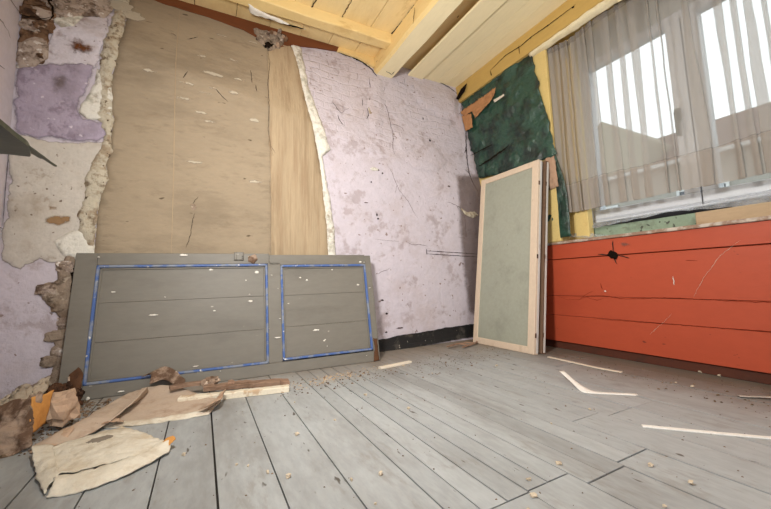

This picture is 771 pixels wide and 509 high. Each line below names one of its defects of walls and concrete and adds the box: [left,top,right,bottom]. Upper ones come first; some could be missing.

flaking render [1,0,129,368]
spalling [253,28,336,255]
crack [602,319,771,332]